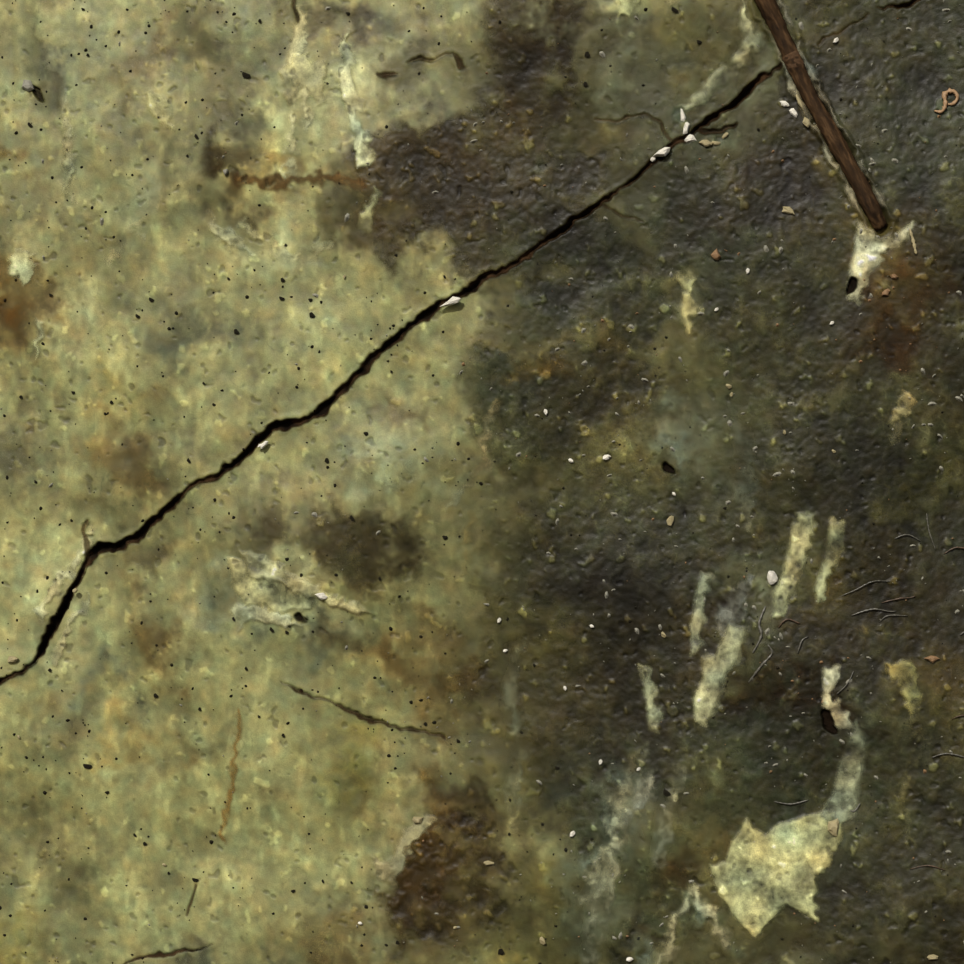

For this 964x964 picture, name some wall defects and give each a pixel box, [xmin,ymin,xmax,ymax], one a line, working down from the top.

crack [291,0,299,22]
crack [879,0,919,10]
crack [376,53,464,77]
water stain [194,120,226,176]
corrosion [234,169,366,190]
spalling [846,224,912,299]
crack [0,62,782,685]
water stain [324,0,964,964]
water stain [285,506,422,592]
spalling [228,553,364,627]
crack [281,682,445,738]
crack [124,948,202,964]